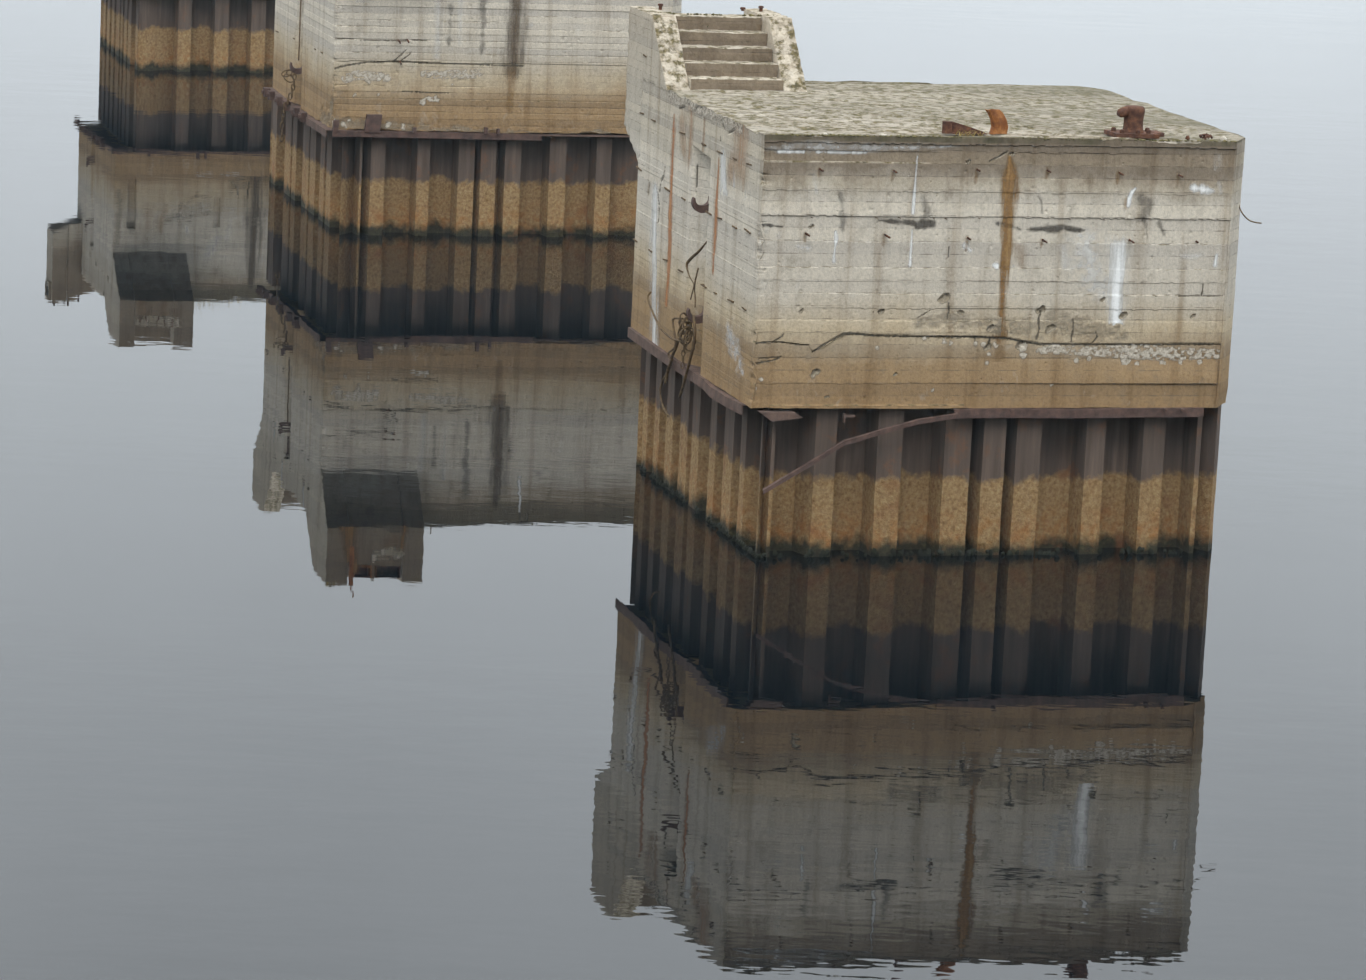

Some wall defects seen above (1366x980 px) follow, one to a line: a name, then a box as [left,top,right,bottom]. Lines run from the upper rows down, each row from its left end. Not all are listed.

corrosion [995,154,1019,340]
damp [1109,241,1125,326]
peeling [974,324,998,365]
crack [752,303,1221,365]
peeling [1015,305,1220,365]